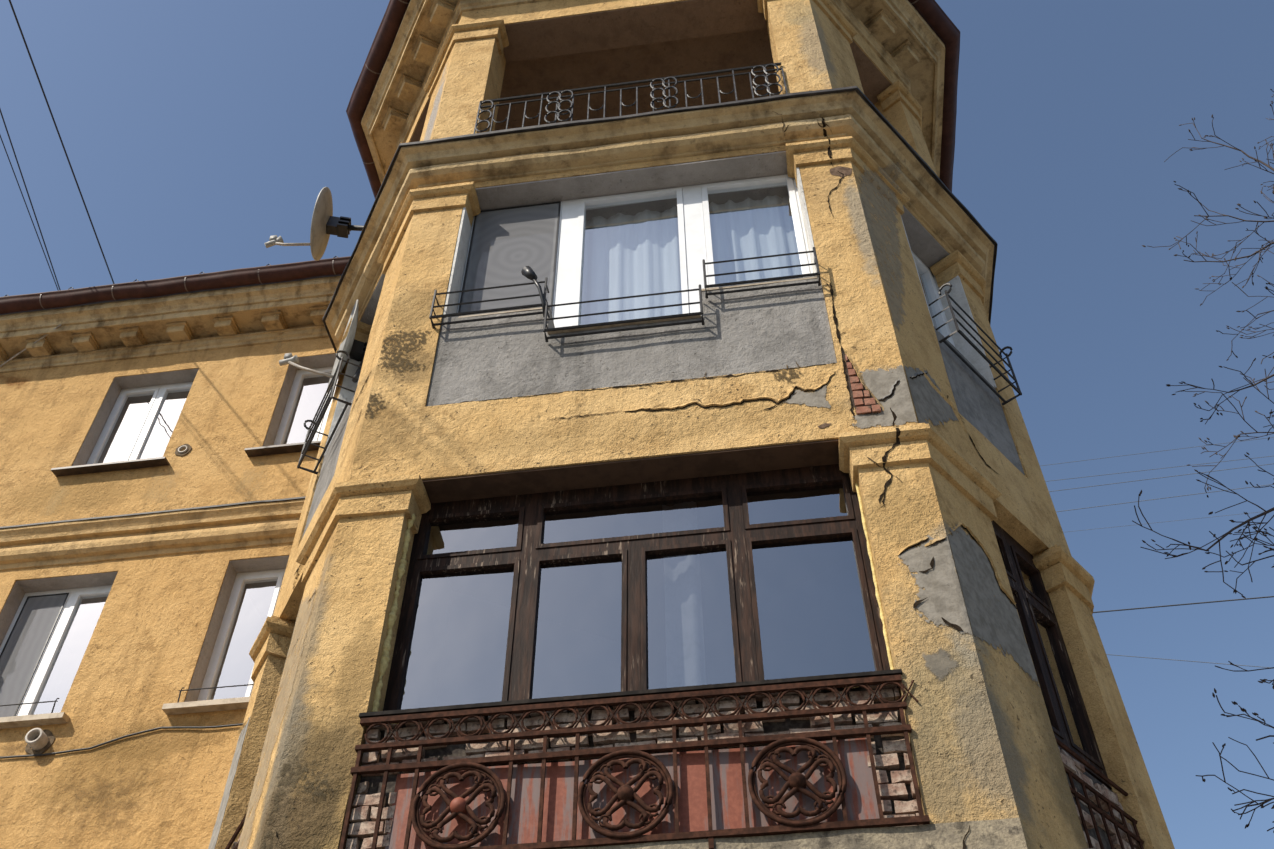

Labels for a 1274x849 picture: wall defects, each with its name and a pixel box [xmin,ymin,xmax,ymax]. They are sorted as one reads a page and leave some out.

crack [772,111,844,218]
crack [826,279,845,343]
spalling [378,327,432,380]
crack [550,372,835,420]
spalling [773,369,831,408]
crack [867,408,902,507]
spalling [841,346,959,429]
crack [919,367,998,474]
spalling [896,520,1040,688]